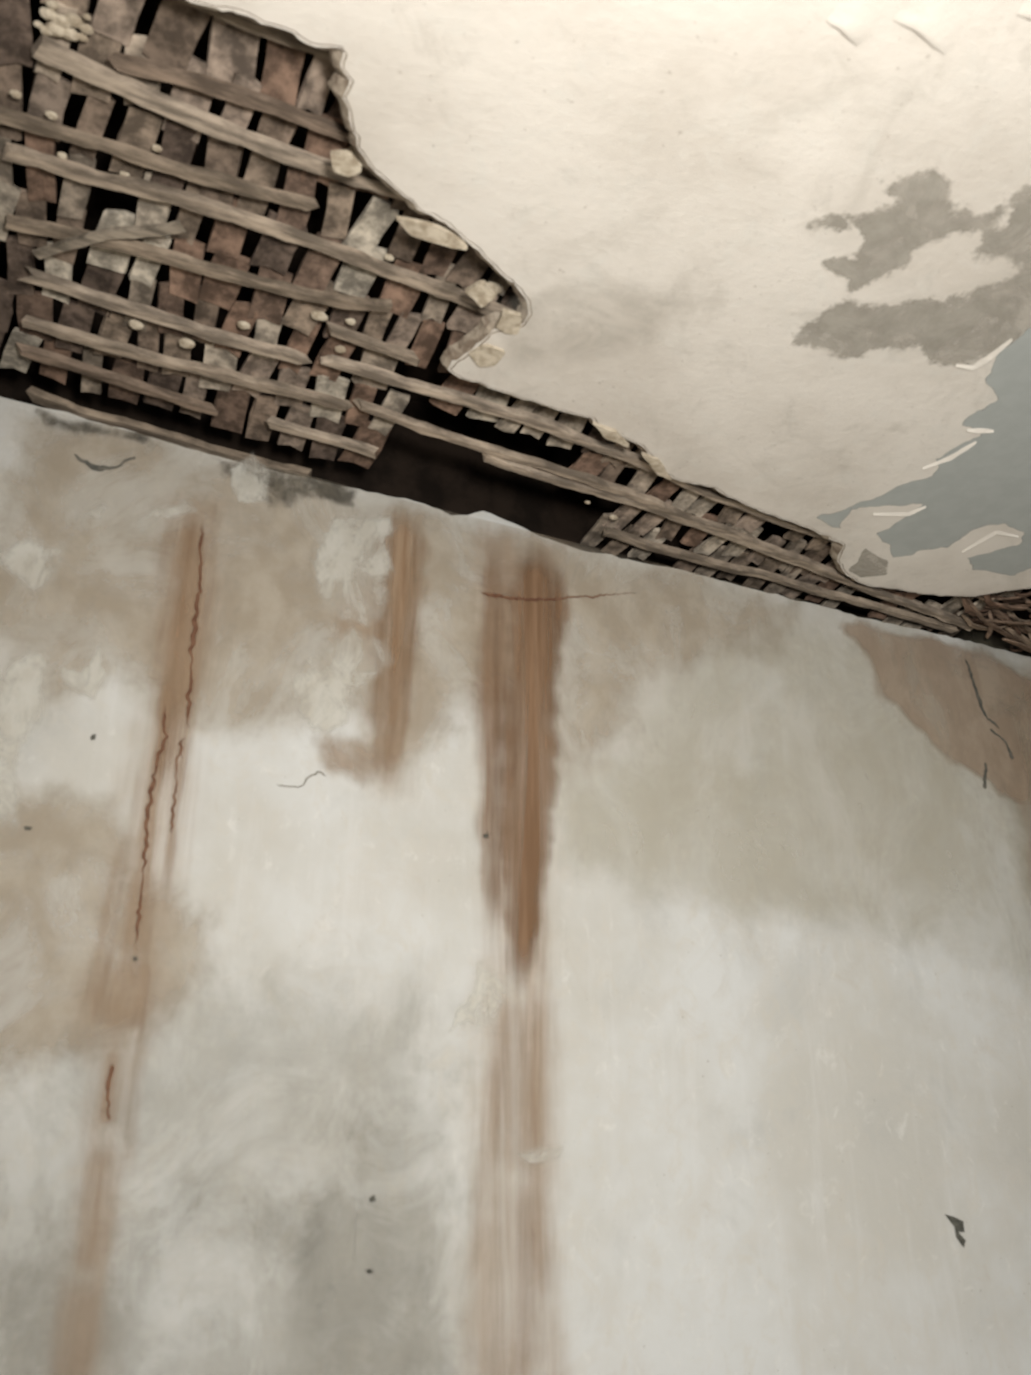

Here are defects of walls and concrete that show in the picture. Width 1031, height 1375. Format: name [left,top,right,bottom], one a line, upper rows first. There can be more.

peeling [330,150,362,177]
peeling [396,215,468,250]
peeling [465,280,522,367]
peeling [593,421,671,480]
peeling [793,170,1031,577]
crack [135,532,204,943]
water stain [0,414,449,770]
peeling [295,518,390,731]
water stain [392,510,769,744]
water stain [845,623,1031,805]
water stain [0,802,197,1054]
crack [106,1065,114,1119]